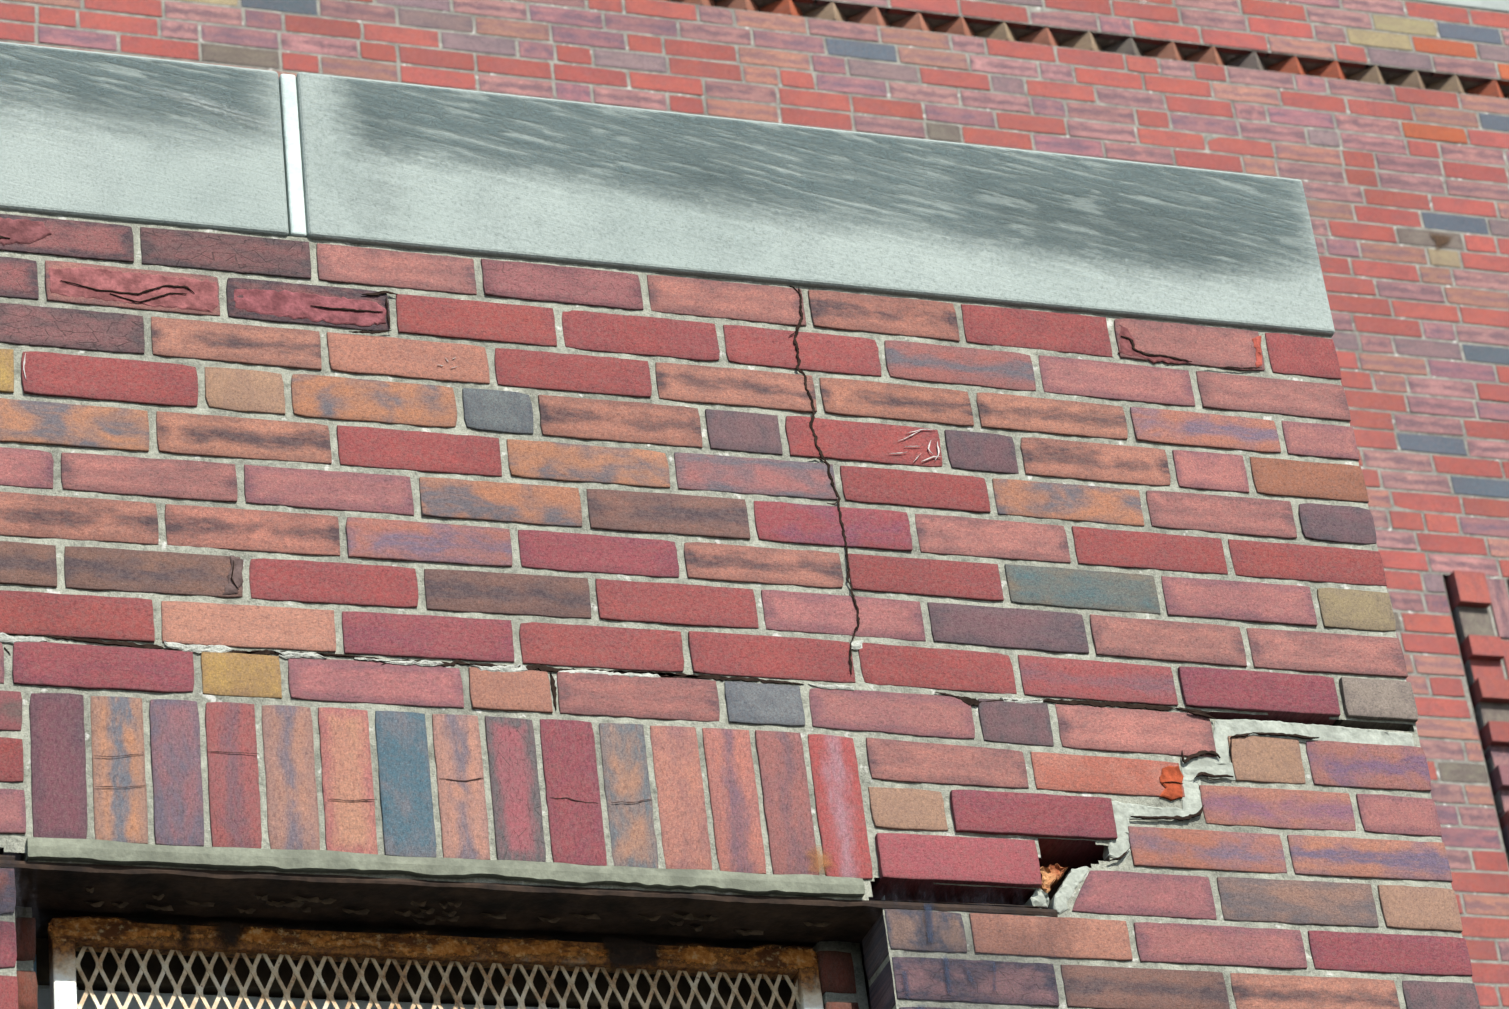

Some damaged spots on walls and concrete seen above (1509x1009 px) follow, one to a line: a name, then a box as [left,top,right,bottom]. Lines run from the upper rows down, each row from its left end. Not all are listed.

spalling [0,217,51,246]
spalling [48,267,398,334]
spalling [1118,324,1263,369]
crack [0,286,864,710]
crack [935,692,1414,914]
corrosion [49,916,819,971]